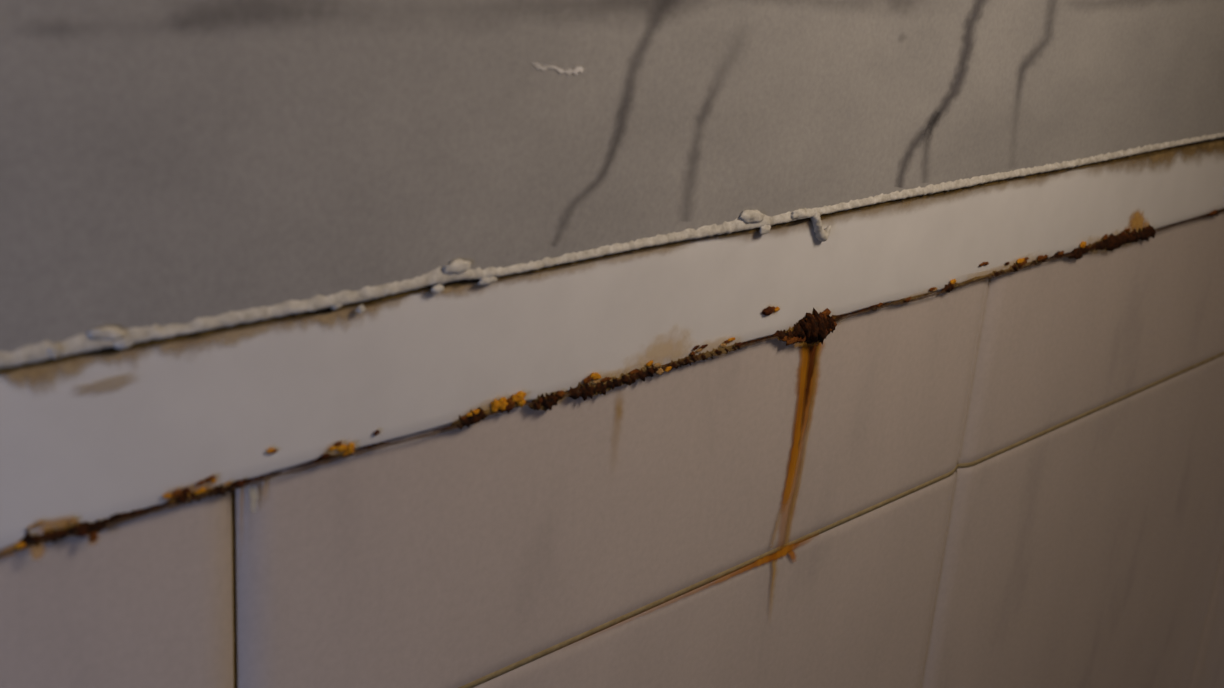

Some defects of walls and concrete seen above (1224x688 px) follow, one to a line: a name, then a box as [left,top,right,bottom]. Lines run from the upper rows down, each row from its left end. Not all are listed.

crack [902,0,981,172]
rust [0,209,1224,592]